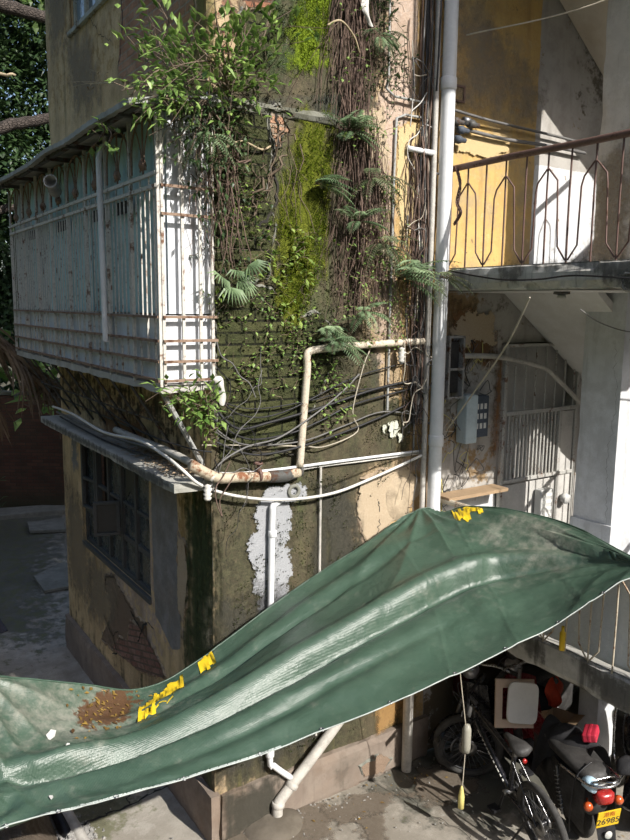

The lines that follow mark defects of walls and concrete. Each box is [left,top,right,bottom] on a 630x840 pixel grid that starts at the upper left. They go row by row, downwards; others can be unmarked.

flaking render [118,0,197,94]
flaking render [237,0,287,68]
corrosion [465,335,503,452]
peeling [357,464,420,542]
flaking render [101,574,167,680]
damp [524,638,545,664]
damp [583,662,630,715]